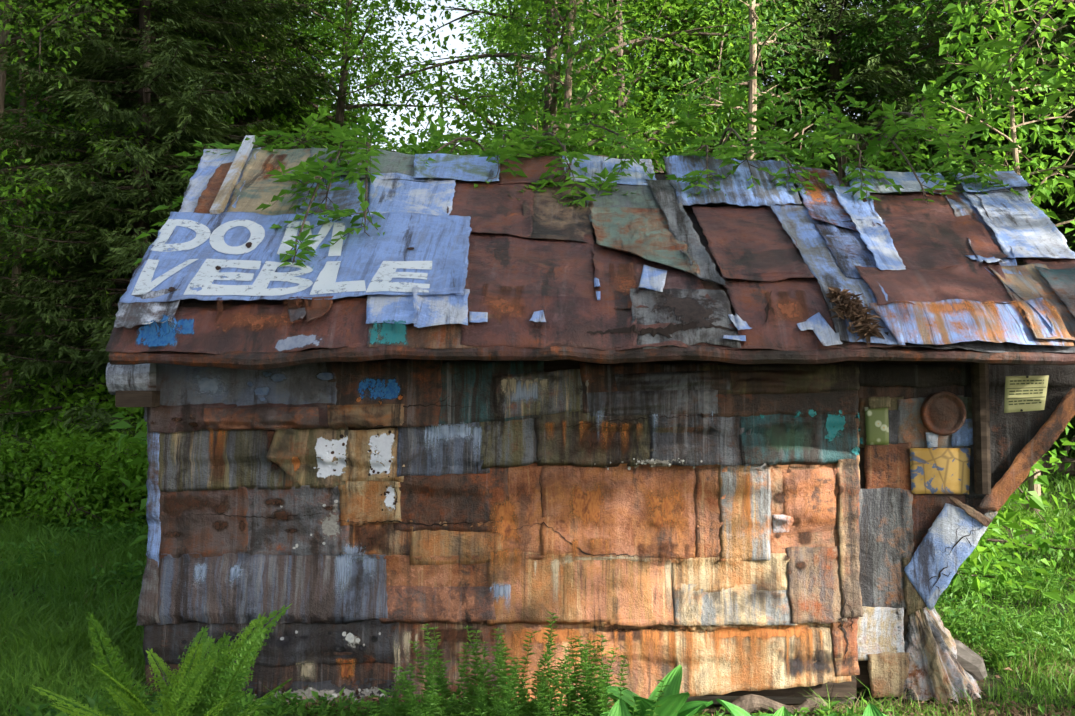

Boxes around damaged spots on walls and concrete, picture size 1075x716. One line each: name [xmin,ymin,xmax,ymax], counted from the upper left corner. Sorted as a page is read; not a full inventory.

corrosion [652,294,721,330]
corrosion [930,300,973,312]
corrosion [1011,301,1029,320]
peeling [136,315,194,347]
peeling [356,378,403,405]
peeling [794,409,863,455]
peeling [314,434,348,478]
peeling [368,430,398,511]
crack [159,477,654,557]
corrosion [800,531,812,544]
corrosion [411,627,692,664]
corrosion [705,625,822,663]